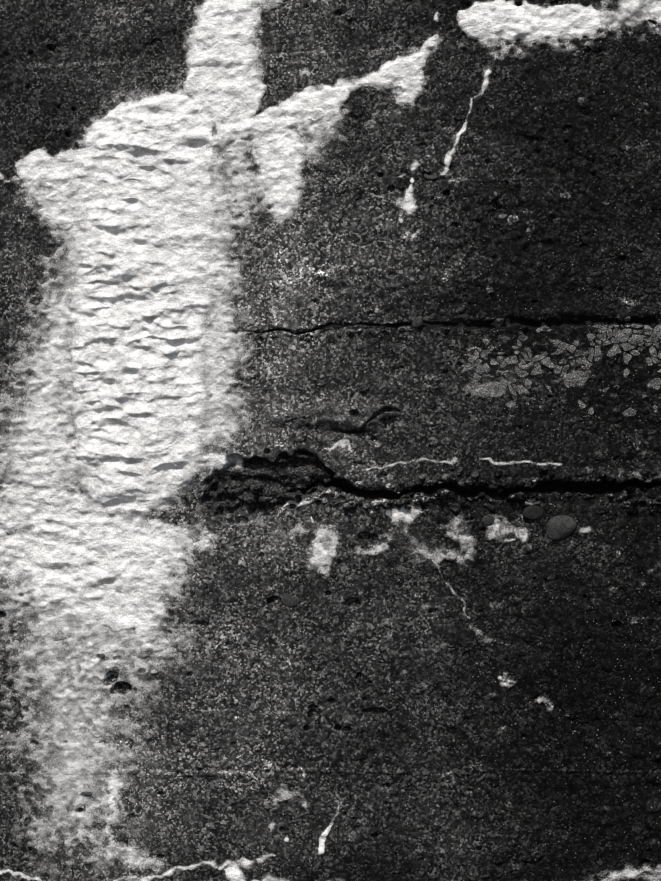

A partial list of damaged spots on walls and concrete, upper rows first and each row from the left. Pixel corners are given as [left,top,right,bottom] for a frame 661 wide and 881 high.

crack [233,314,660,335]
peeling [461,316,661,417]
crack [298,451,661,512]